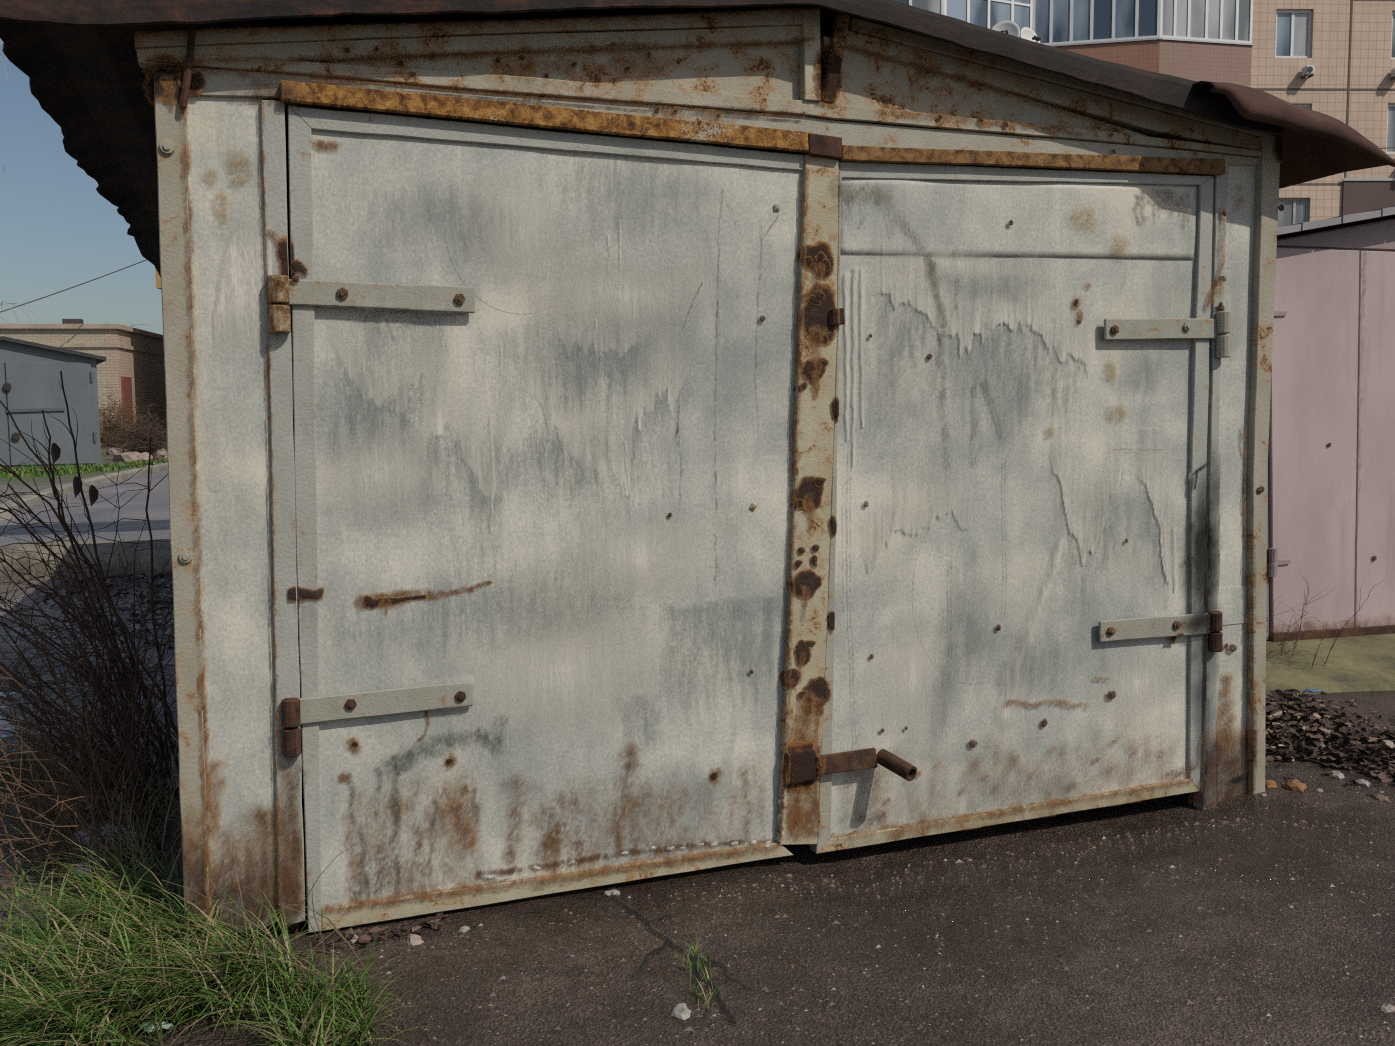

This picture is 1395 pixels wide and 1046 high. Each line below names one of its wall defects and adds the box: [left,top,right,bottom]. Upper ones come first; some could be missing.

rust [143,35,1118,154]
rust [180,140,324,946]
rust [322,168,1258,912]
crack [608,884,750,1024]